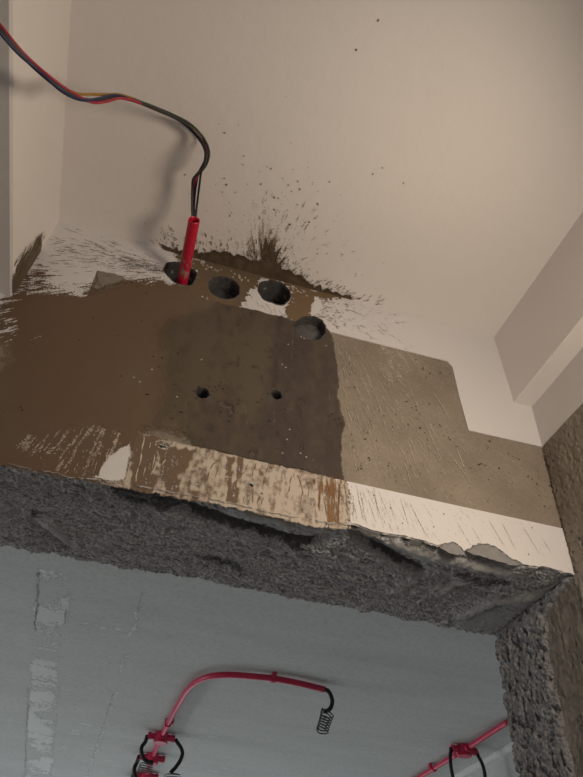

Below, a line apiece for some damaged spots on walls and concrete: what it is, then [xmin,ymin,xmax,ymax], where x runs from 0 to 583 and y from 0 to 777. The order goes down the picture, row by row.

spalling [8,463,194,512]
spalling [422,541,540,569]